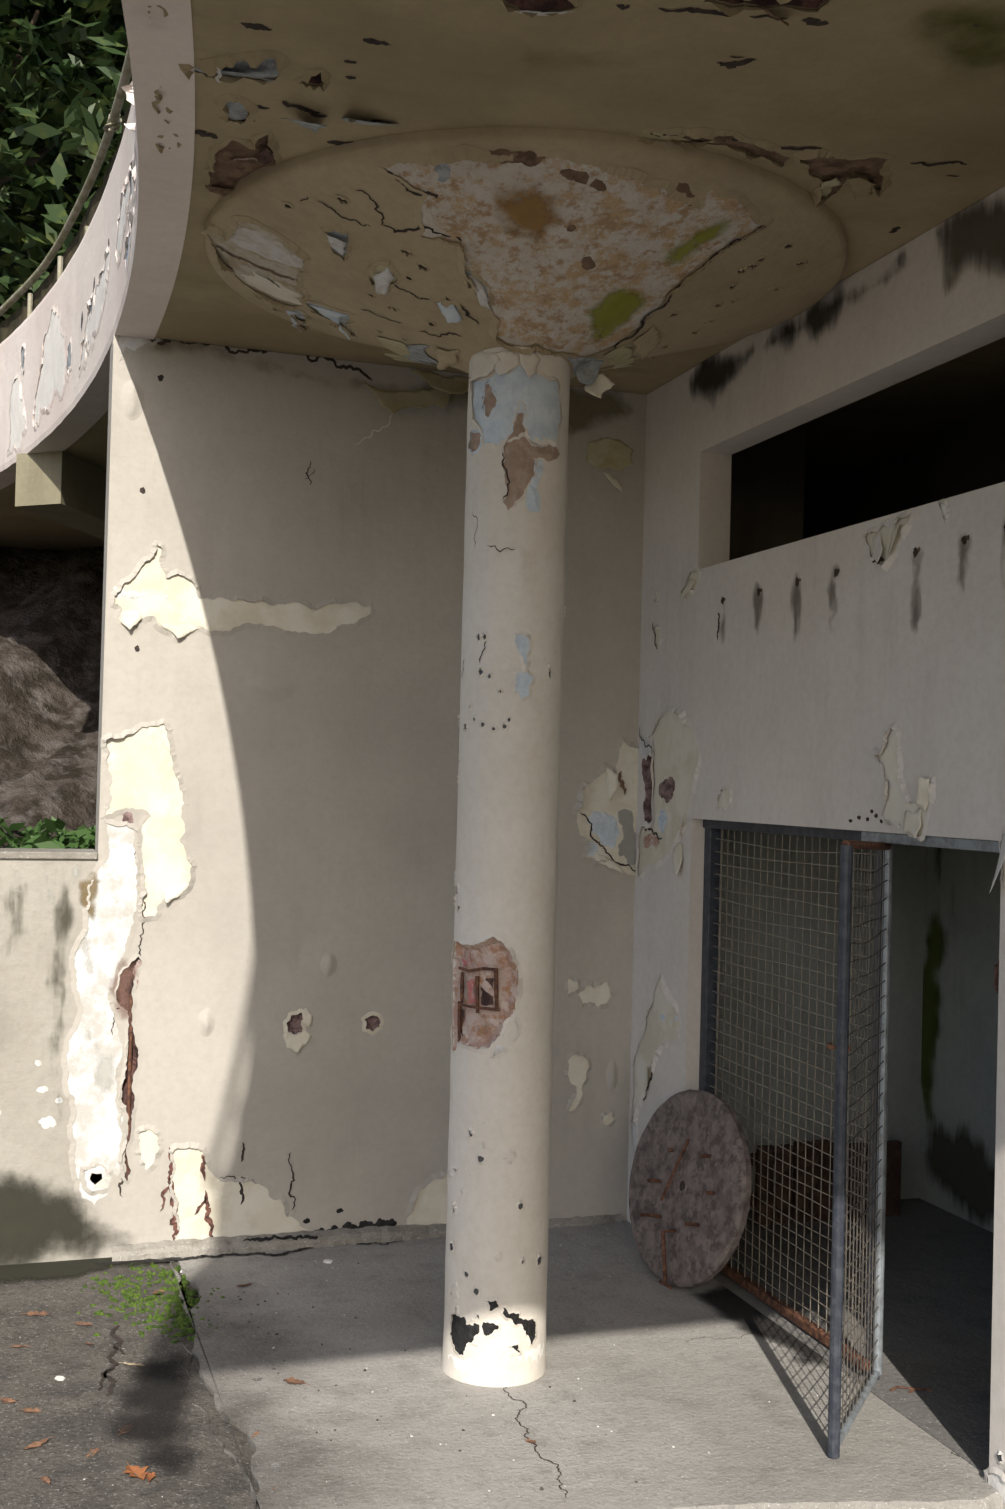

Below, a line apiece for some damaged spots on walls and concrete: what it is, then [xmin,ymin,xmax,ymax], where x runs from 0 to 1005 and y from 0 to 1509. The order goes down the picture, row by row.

peeling [201,216,358,340]
crack [301,171,461,241]
crack [360,284,479,337]
peeling [355,145,774,513]
leakage [690,351,753,395]
leakage [771,294,856,344]
leakage [938,202,1005,286]
peeling [109,539,376,643]
peeling [36,718,316,1241]
leakage [927,1127,995,1223]
spalling [448,1269,544,1373]
crack [503,1387,568,1497]